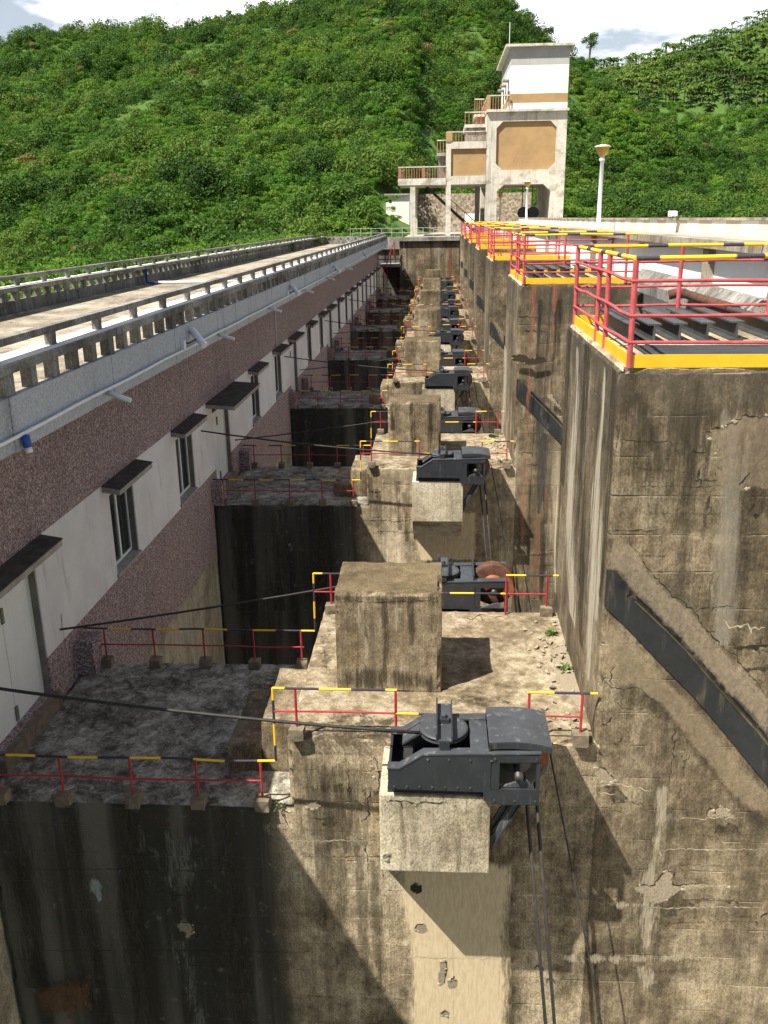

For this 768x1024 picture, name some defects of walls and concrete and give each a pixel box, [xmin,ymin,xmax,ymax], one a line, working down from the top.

leakage [554,327,763,682]
crack [613,528,768,696]
crack [602,667,655,701]
crack [598,729,680,795]
spalling [706,805,733,817]
spalling [410,882,422,894]
spalling [632,868,735,903]
spalling [178,920,195,938]
spalling [438,959,457,989]